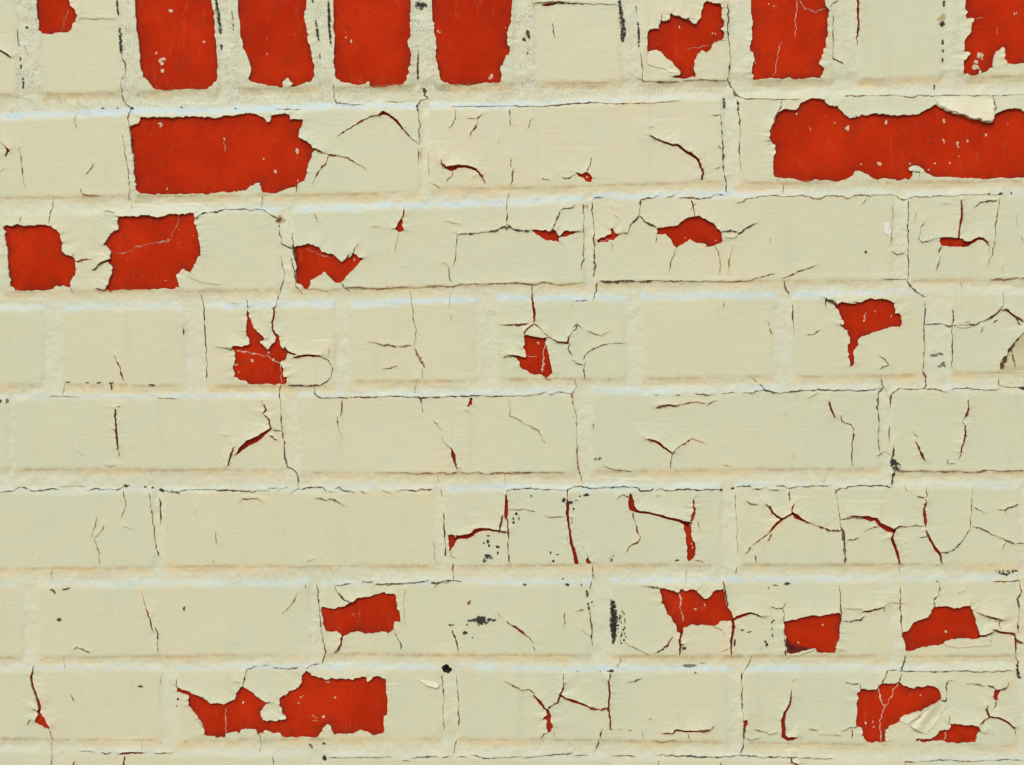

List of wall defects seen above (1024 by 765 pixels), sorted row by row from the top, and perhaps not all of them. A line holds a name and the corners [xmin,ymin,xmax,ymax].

peeling [135,0,218,91]
peeling [238,0,315,88]
peeling [333,0,411,88]
peeling [432,0,512,86]
peeling [647,2,724,79]
peeling [750,0,829,80]
peeling [130,113,317,195]
peeling [769,98,1024,182]
peeling [4,224,76,291]
peeling [104,213,201,292]
crack [149,0,1024,683]
peeling [177,671,388,738]